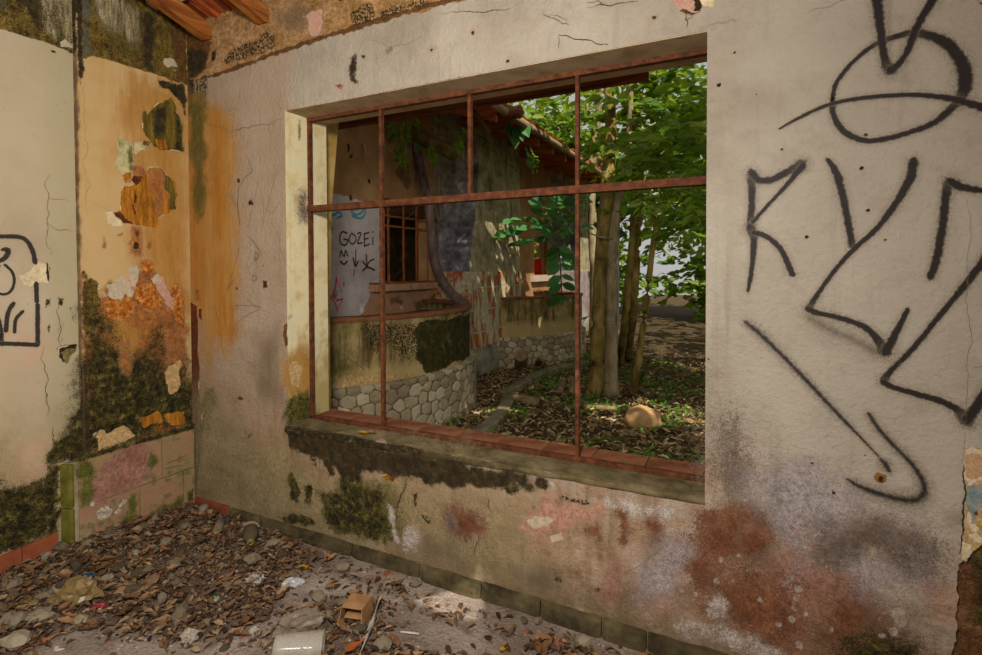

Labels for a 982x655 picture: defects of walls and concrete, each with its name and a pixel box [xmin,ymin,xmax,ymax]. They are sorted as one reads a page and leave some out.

peeling [187,0,464,82]
peeling [673,0,715,15]
peeling [105,97,184,228]
spalling [191,288,202,430]
damp [46,298,544,583]
damp [592,400,958,655]
spalling [951,446,982,655]